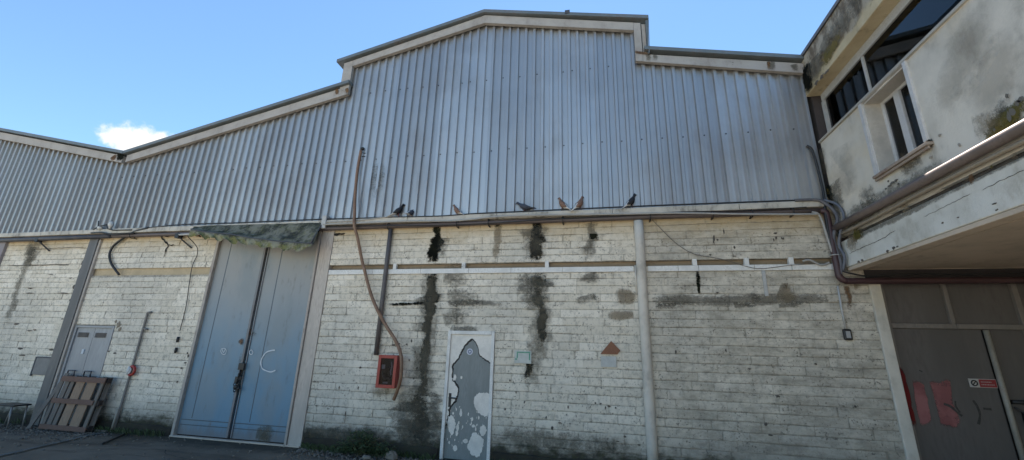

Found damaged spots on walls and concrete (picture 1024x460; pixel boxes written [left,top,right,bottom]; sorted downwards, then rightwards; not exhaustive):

leakage [7,243,40,315]
leakage [389,227,492,444]
leakage [521,223,546,260]
leakage [518,273,550,378]
peeling [445,334,492,457]